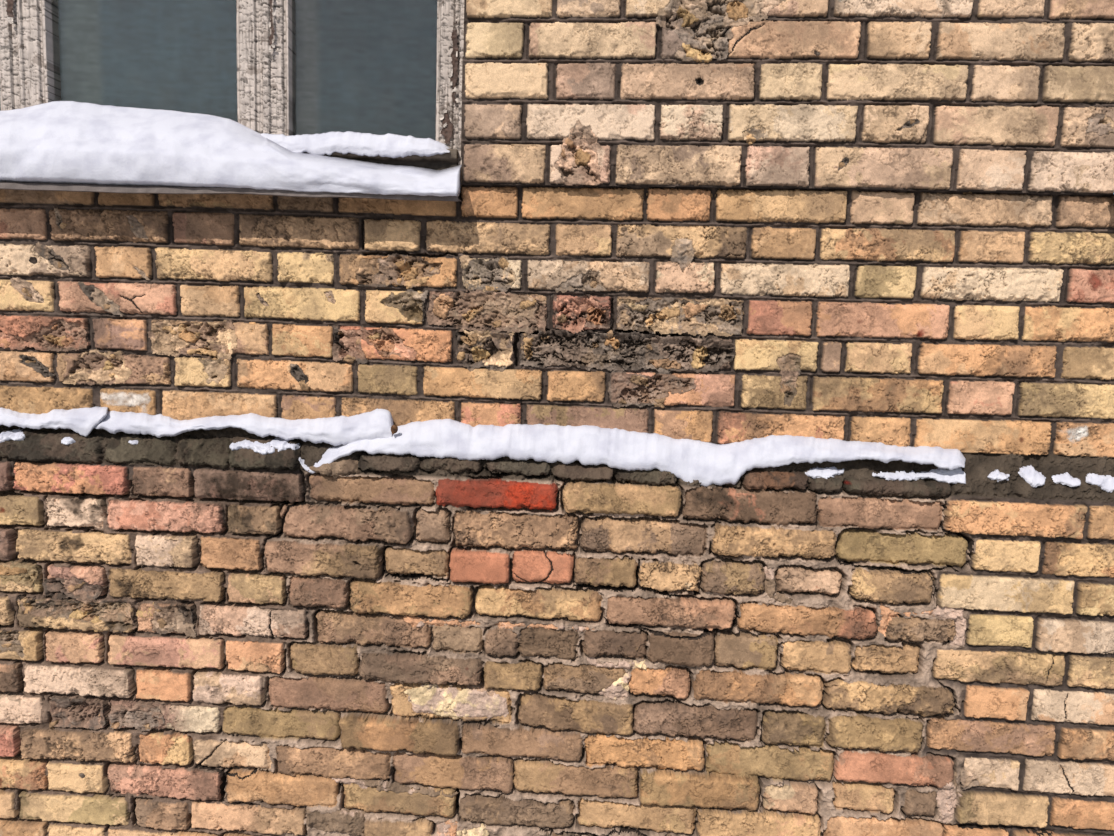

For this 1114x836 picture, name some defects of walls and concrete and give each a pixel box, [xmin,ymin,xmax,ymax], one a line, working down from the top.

spalling [656,0,786,63]
spalling [555,120,602,186]
spalling [331,325,417,365]
spalling [356,253,745,408]
crack [513,551,700,598]
crack [605,606,739,640]